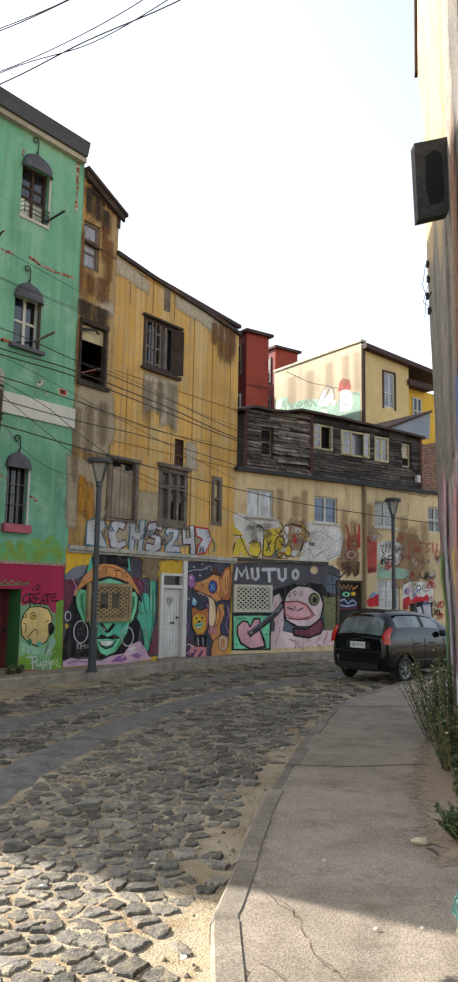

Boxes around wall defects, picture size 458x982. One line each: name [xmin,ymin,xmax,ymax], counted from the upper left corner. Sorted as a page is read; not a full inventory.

rust [80,226,114,303]
crack [252,879,346,982]